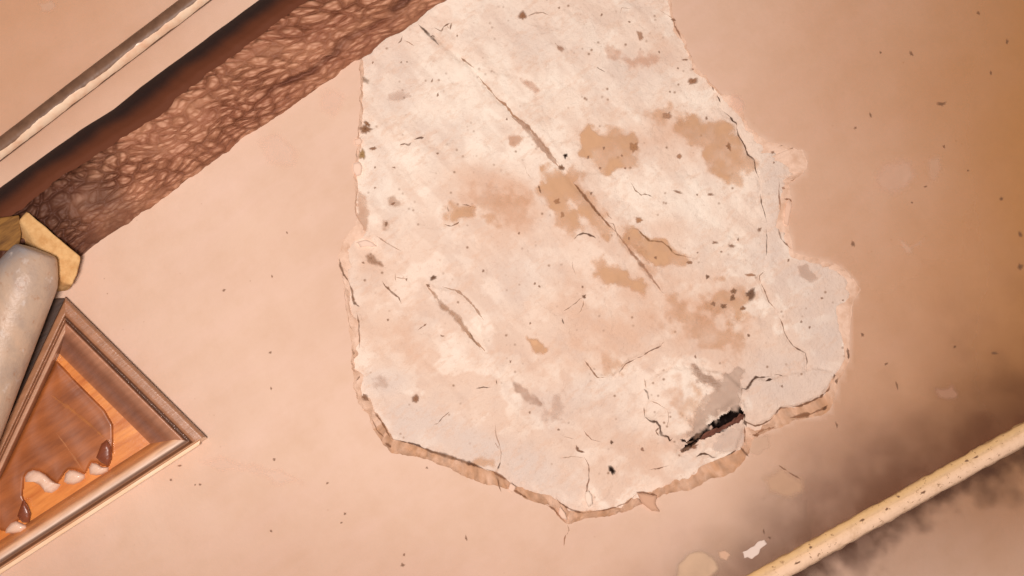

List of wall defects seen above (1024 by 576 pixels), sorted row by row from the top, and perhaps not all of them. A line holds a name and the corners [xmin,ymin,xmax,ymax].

crack [462,59,678,289]
water stain [537,167,609,241]
water stain [578,125,637,176]
water stain [675,115,745,184]
spalling [338,0,861,524]
water stain [595,265,646,293]
crack [697,388,829,457]